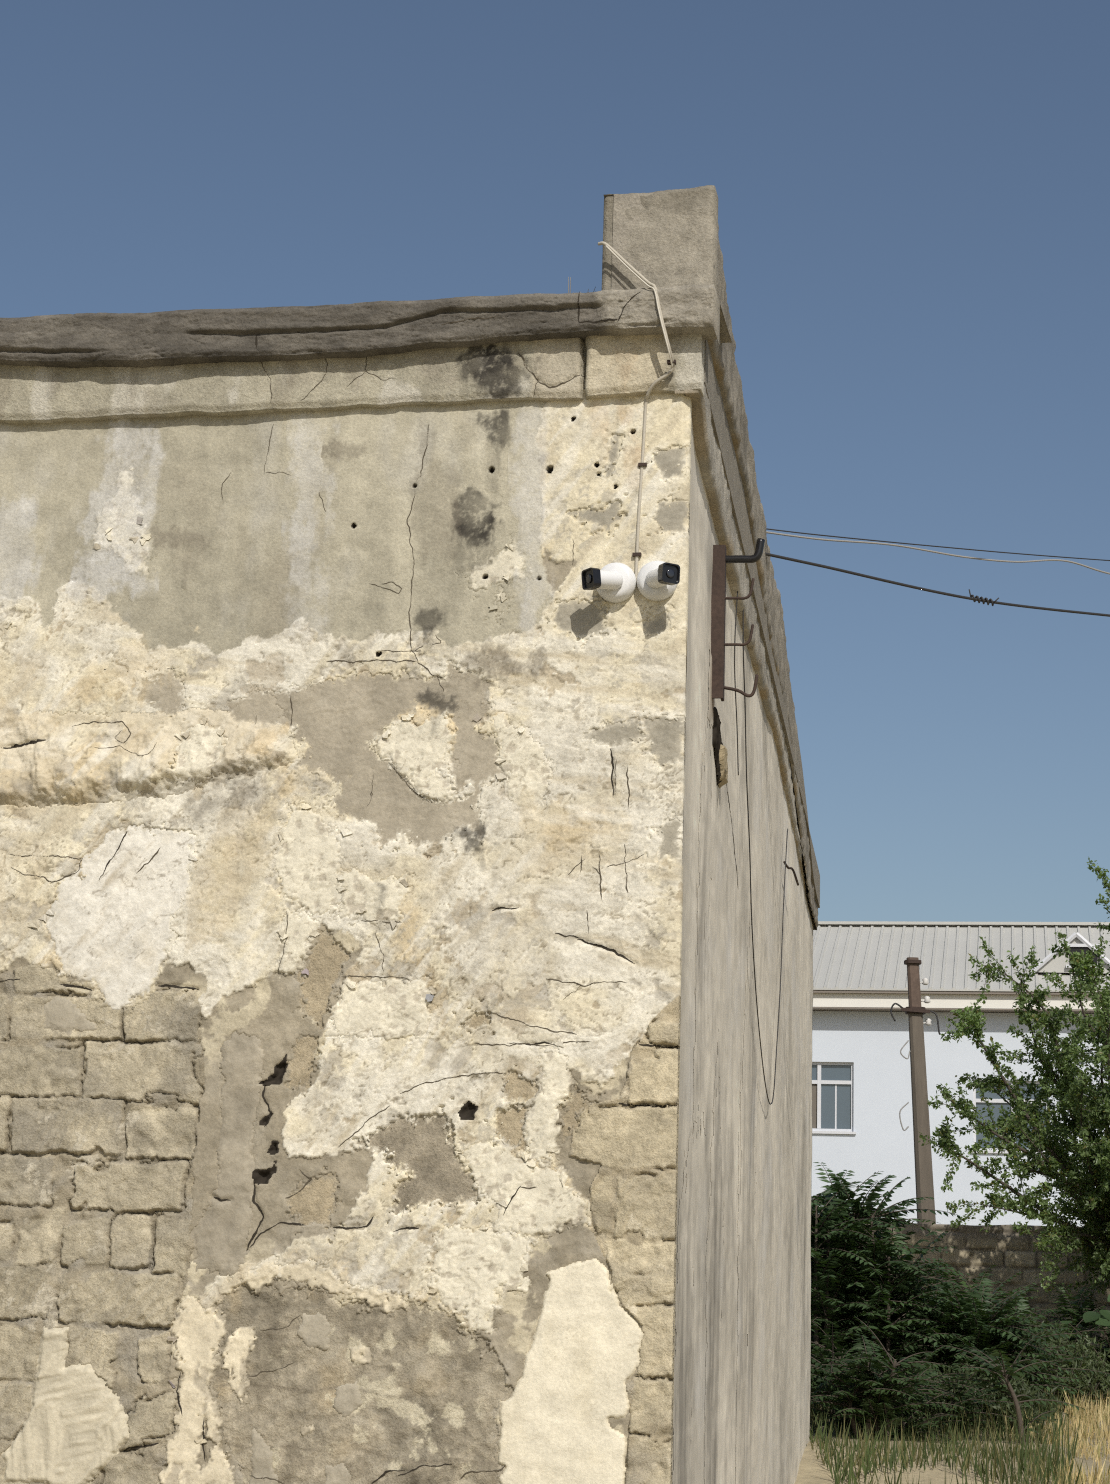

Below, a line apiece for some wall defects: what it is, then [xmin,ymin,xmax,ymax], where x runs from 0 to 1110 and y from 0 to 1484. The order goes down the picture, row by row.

crack [326,425,444,692]
damp [402,342,560,740]
spalling [583,709,686,768]
spalling [135,656,556,1099]
spalling [645,812,684,869]
crack [342,920,413,981]
crack [340,933,635,1146]
crack [639,1042,680,1050]
crack [262,1085,272,1127]
spalling [0,821,681,1484]
crack [214,1170,419,1251]